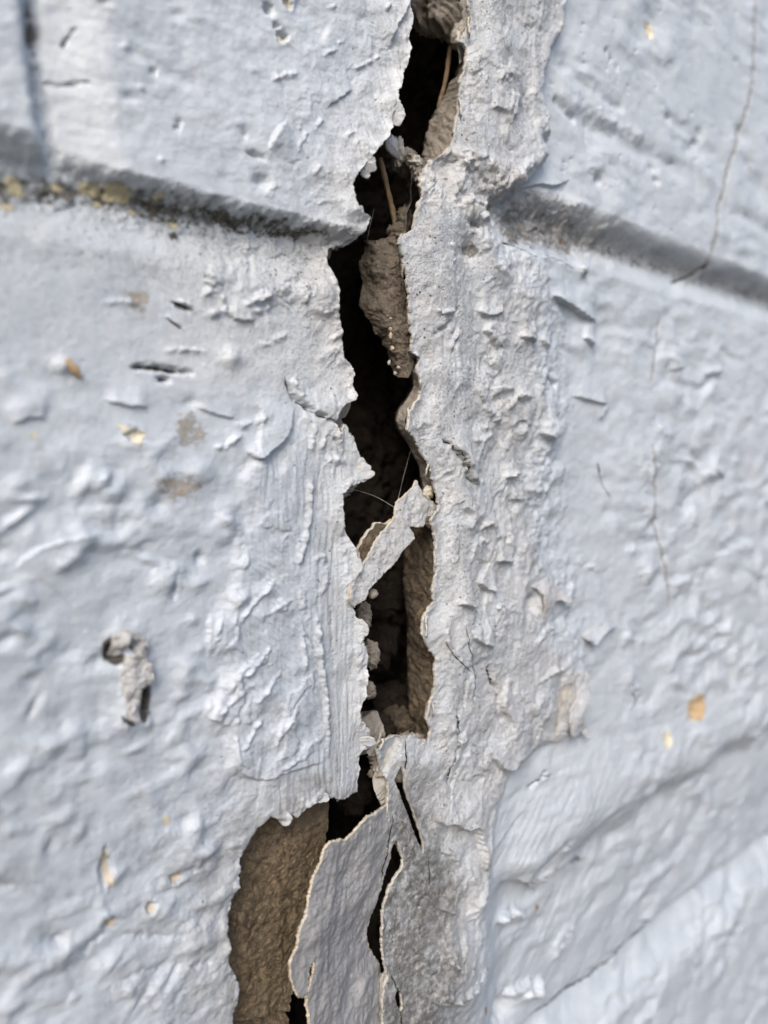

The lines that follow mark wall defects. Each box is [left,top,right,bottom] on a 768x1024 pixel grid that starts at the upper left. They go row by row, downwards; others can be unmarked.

crack [670,0,756,288]
crack [262,0,497,1024]
crack [651,442,669,602]
peeling [227,801,391,1024]